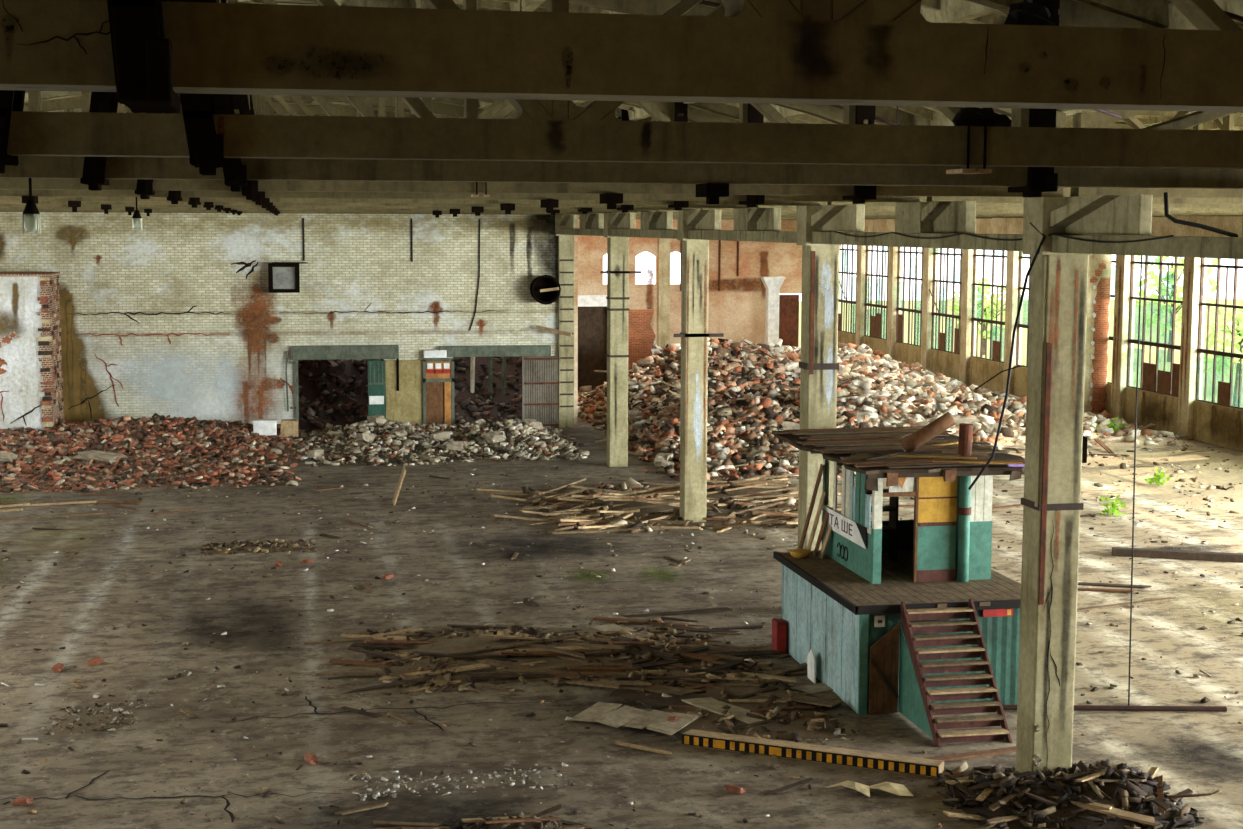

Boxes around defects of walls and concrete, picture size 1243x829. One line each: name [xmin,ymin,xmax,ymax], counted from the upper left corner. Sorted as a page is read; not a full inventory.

crack [2,0,110,55]
flaking render [0,332,16,375]
rust [237,283,284,421]
rust [1049,260,1061,400]